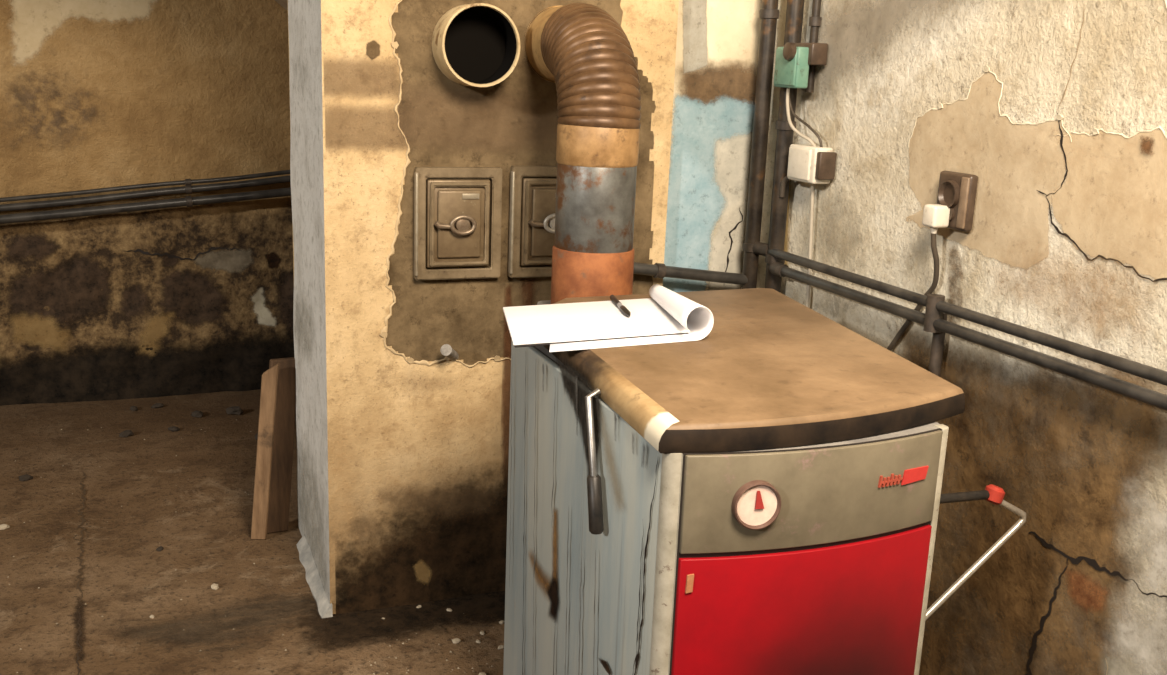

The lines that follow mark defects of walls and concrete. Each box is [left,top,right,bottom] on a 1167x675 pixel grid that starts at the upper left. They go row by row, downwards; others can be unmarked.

spalling [366,0,623,367]
peeling [632,57,754,295]
peeling [906,65,1167,279]
crack [1037,2,1167,282]
spalling [8,235,294,354]
water stain [0,306,309,406]
rust [502,287,512,483]
rust [524,281,533,306]
crack [74,470,87,675]
water stain [299,399,536,649]
water stain [903,332,1167,675]
crack [1025,531,1167,675]